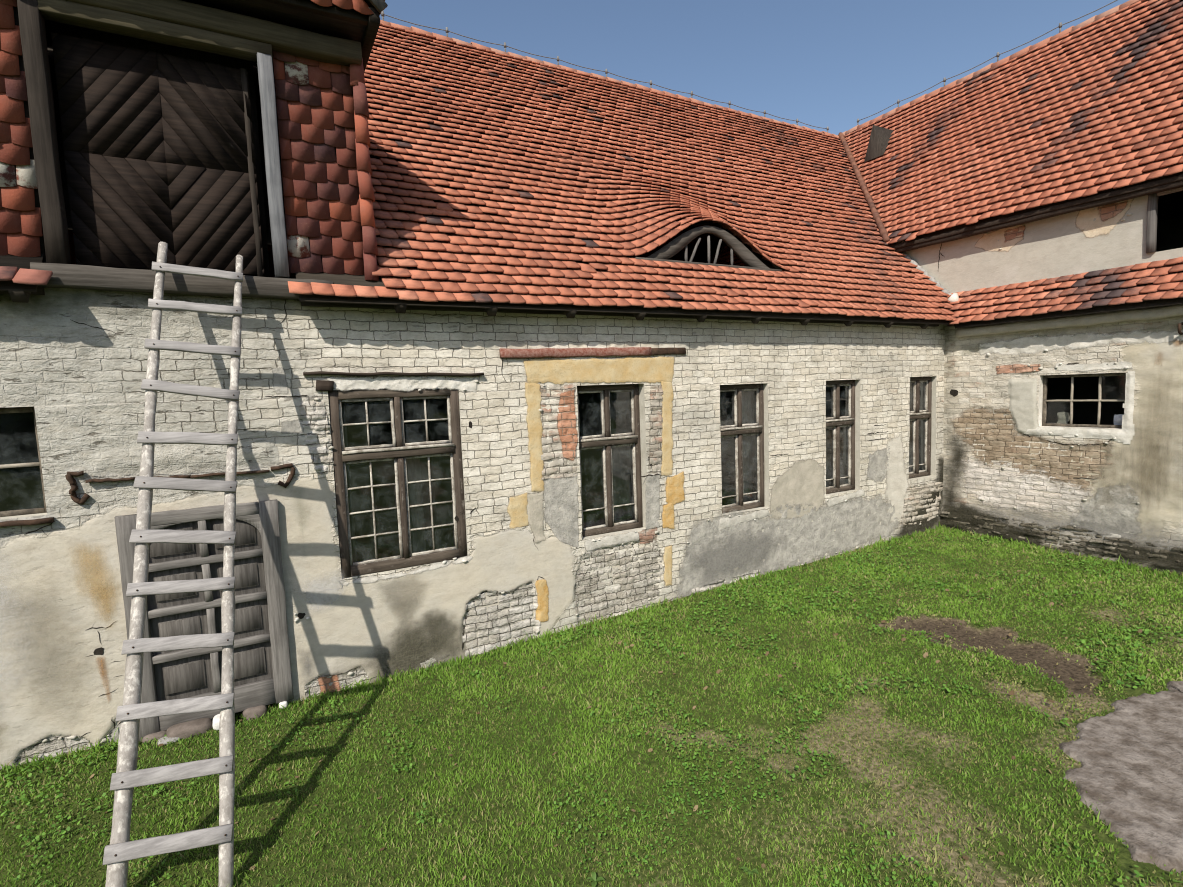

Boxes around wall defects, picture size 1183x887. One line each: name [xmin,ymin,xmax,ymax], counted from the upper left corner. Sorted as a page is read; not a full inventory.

flaking render [539,384,578,479]
leakage [698,537,771,579]
flaking render [899,407,1183,576]
leakage [954,507,1183,552]
leakage [377,619,460,681]
spalling [411,582,540,673]